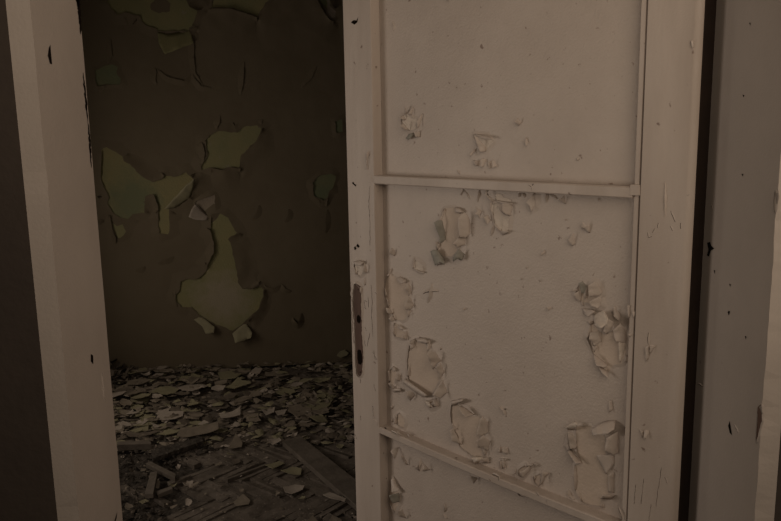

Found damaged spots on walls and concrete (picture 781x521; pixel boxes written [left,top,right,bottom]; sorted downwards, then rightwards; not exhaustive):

peeling [194,0,358,82]
peeling [92,140,272,343]
peeling [431,205,471,265]
peeling [384,269,447,412]
peeling [570,277,635,379]
peeling [563,420,619,510]